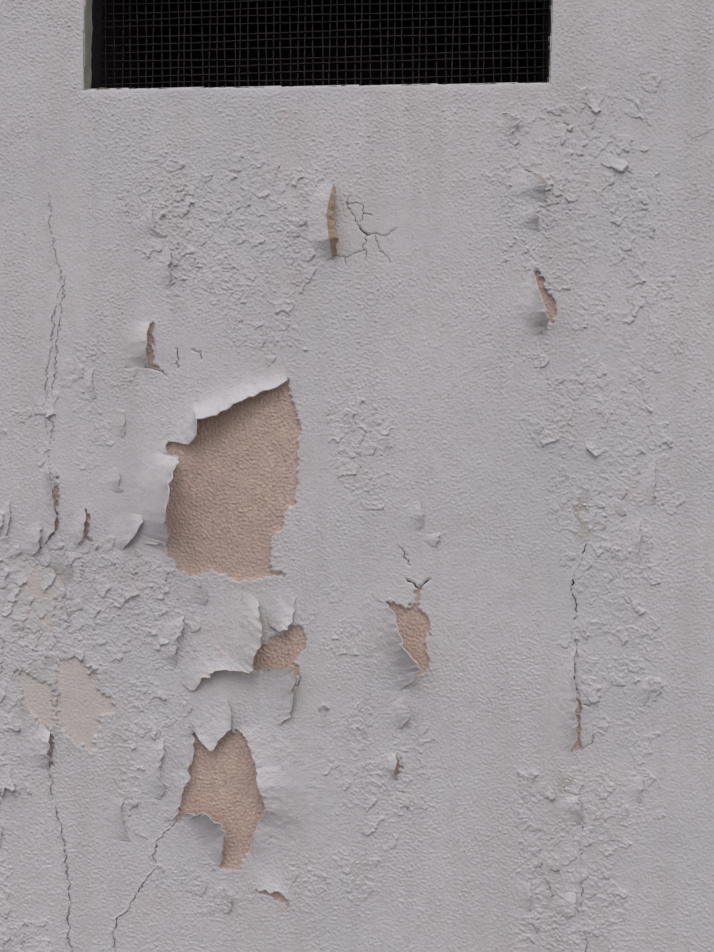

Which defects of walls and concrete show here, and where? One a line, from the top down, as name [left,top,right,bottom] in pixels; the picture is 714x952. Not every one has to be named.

crack [41,194,65,458]
crack [338,195,394,263]
peeling [510,268,556,335]
peeling [481,62,662,272]
peeling [0,141,435,908]
crack [567,541,588,650]
peeling [510,463,685,952]
peeling [0,824,52,952]
crack [46,768,72,952]